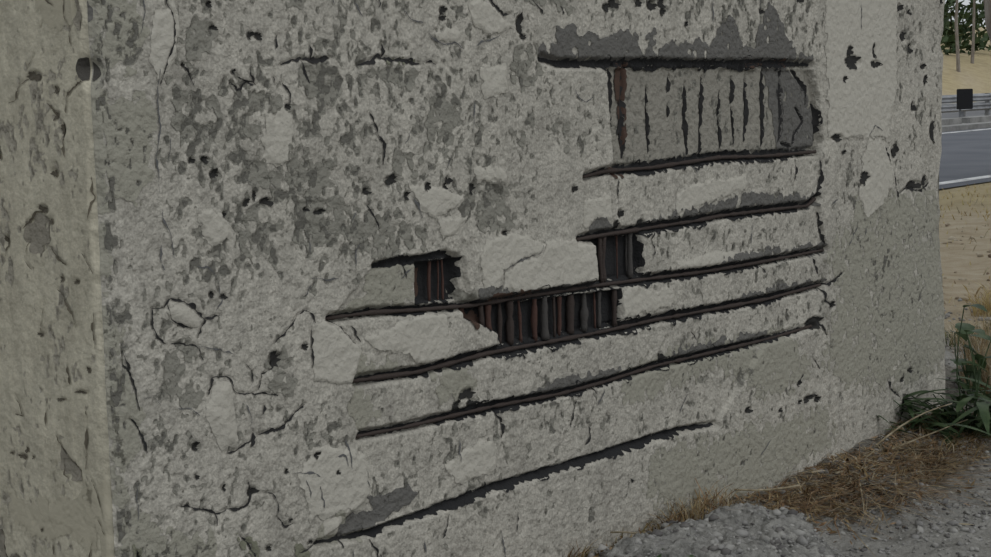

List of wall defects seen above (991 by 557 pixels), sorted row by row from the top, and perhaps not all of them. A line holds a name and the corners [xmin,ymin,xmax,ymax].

spalling [0,197,95,409]
crack [141,0,194,188]
crack [122,218,361,454]
crack [230,35,329,102]
crack [358,0,512,65]
spalling [93,0,883,557]
rust [325,248,824,330]
rust [355,324,812,439]
rust [353,283,821,383]
rust [583,150,817,179]
spalling [829,0,943,419]
spalling [0,410,88,557]